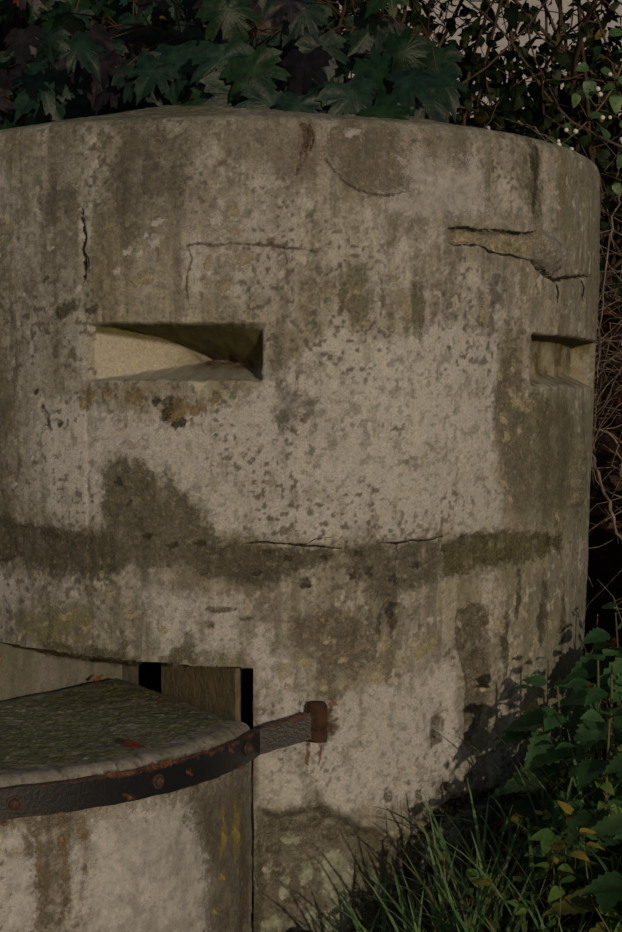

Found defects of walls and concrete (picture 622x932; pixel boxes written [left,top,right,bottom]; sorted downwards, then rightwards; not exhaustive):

crack [81,209,90,280]
crack [185,242,225,301]
crack [247,242,312,272]
crack [448,226,591,304]
crack [249,537,342,549]
crack [383,535,443,563]